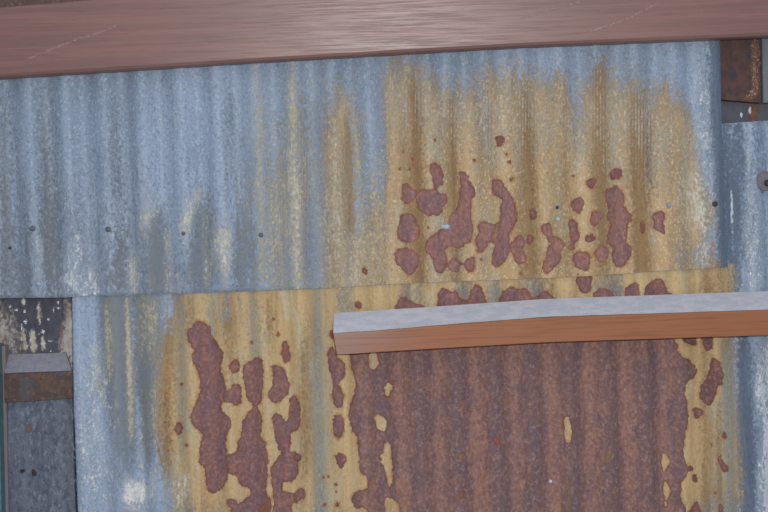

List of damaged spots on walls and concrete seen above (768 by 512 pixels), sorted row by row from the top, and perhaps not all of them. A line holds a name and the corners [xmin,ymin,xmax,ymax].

rust [125,55,743,512]
rust [740,40,760,121]